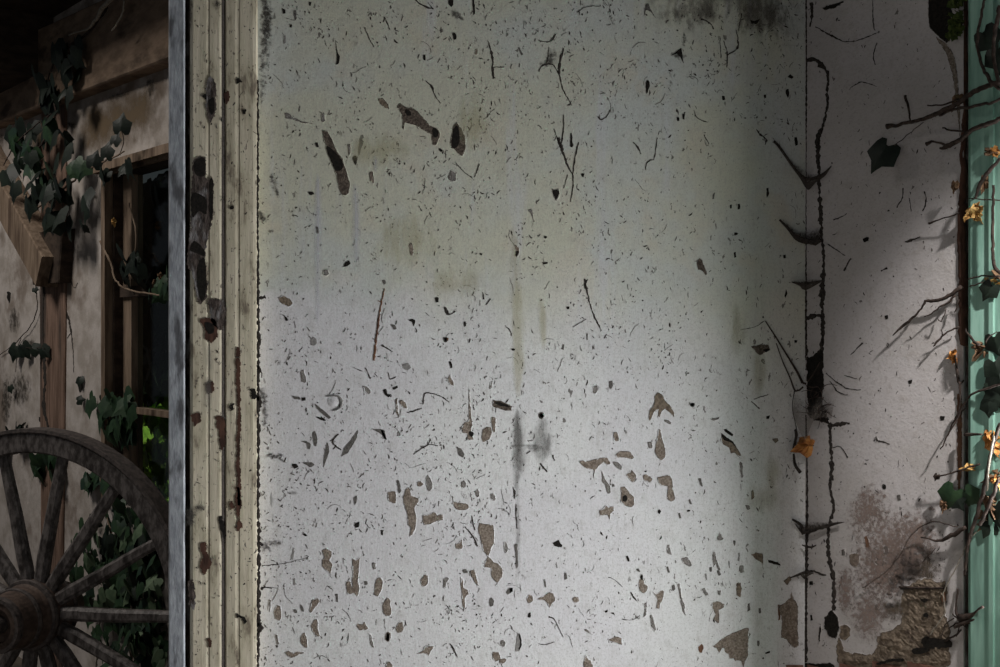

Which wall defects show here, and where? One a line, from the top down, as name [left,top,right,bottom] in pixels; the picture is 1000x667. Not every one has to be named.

flaking render [284,113,364,196]
flaking render [378,98,466,156]
crack [633,129,666,187]
crack [689,0,879,395]
peeling [186,157,227,343]
flaking render [388,475,444,537]
crack [405,439,533,546]
flaking render [443,523,518,609]
flaking render [579,432,676,520]
crack [805,415,850,662]
damp [835,490,941,639]
flaking render [786,577,952,667]